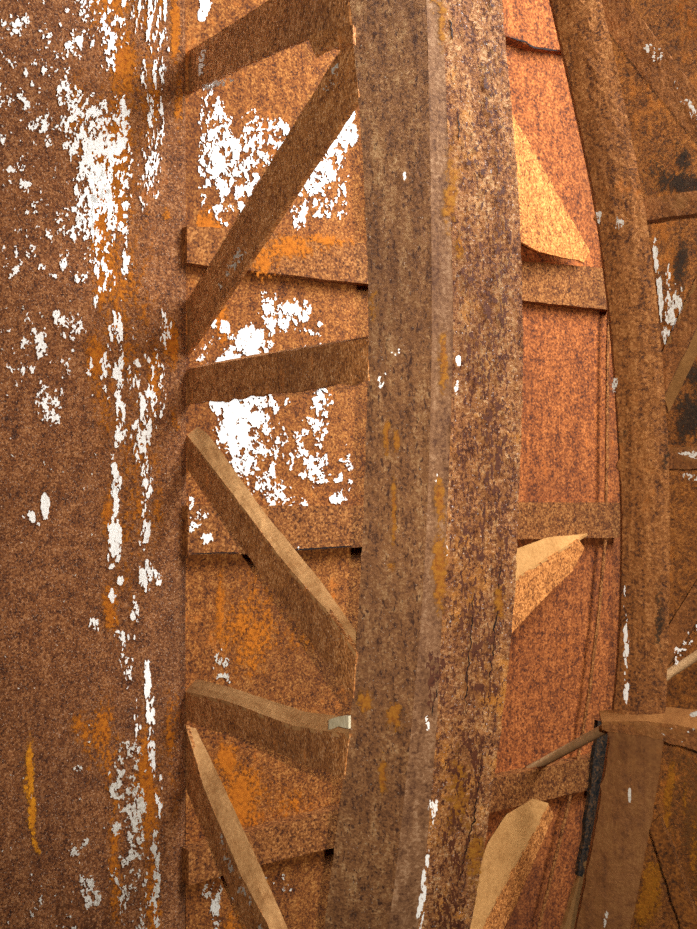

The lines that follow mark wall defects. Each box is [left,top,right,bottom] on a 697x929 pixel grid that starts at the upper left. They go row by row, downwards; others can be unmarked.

peeling [0,0,170,308]
peeling [198,49,290,227]
peeling [291,111,358,230]
rust [68,0,183,632]
peeling [86,310,172,622]
peeling [209,388,353,506]
rust [431,40,517,929]
rust [24,741,41,854]
rust [73,700,120,783]
rust [108,800,123,924]
peeling [104,660,163,929]
rust [133,691,180,929]